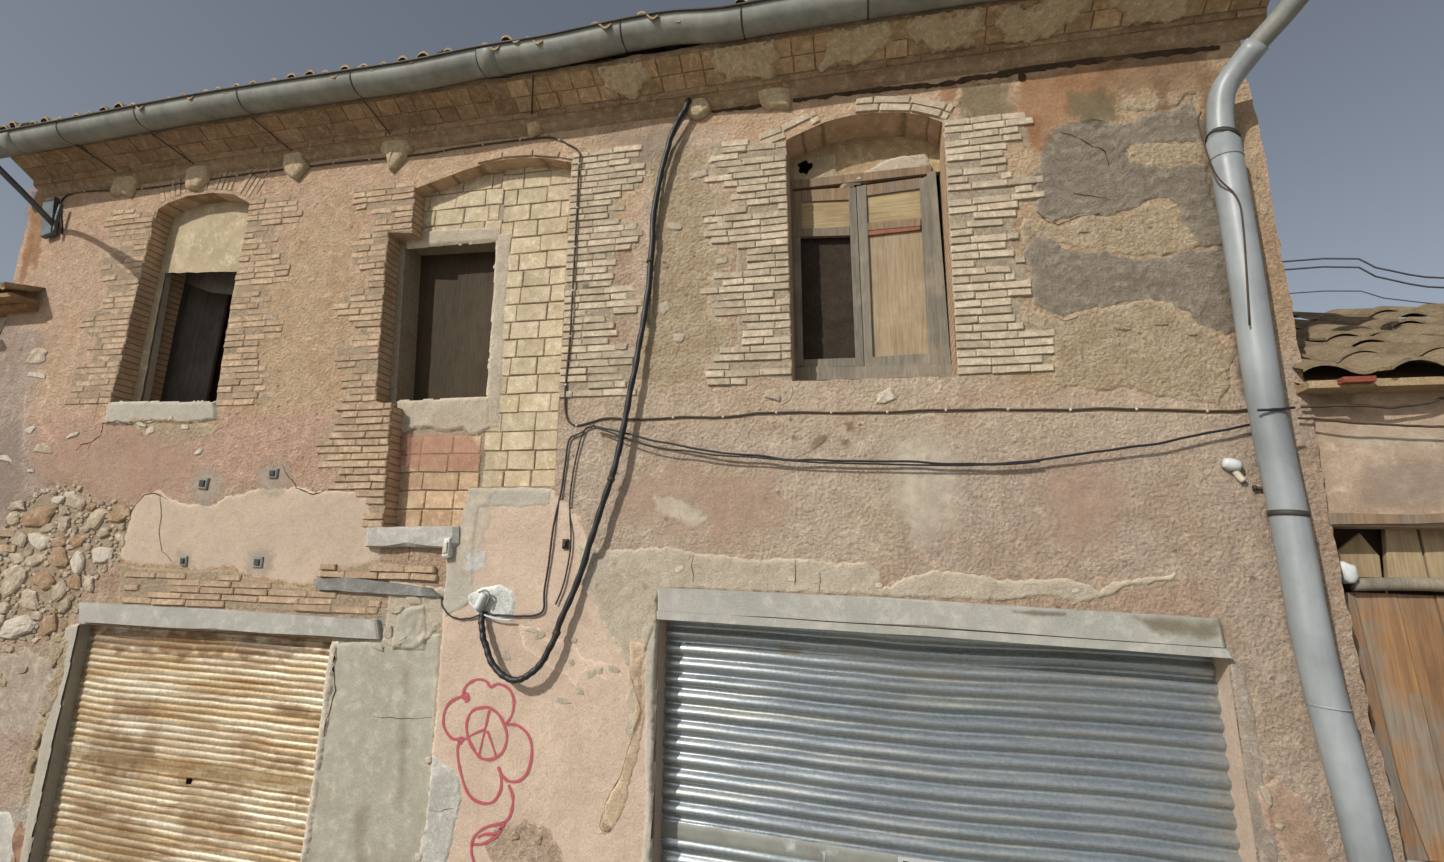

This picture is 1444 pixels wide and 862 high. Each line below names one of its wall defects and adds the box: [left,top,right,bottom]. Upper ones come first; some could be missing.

peeling [597,61,653,100]
peeling [711,39,780,83]
spalling [1127,142,1209,168]
spalling [1020,200,1199,257]
crack [125,493,170,559]
peeling [415,755,462,862]
spalling [485,818,565,862]